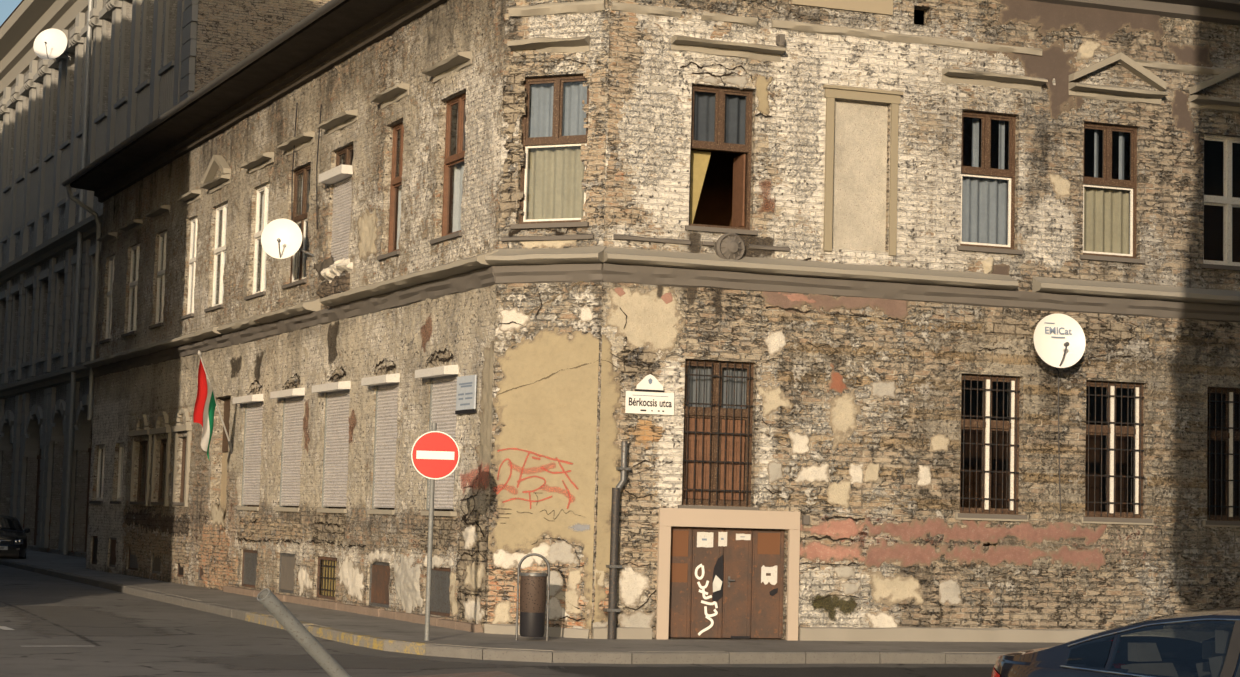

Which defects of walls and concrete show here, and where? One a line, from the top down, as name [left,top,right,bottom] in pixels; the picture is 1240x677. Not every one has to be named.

crack [680,61,772,117]
spalling [498,294,542,332]
spalling [580,285,686,383]
peeling [764,329,787,356]
crack [496,359,620,396]
peeling [758,385,793,417]
spalling [627,418,673,467]
rust [670,530,689,582]
rust [757,533,780,555]
leakage [812,594,857,621]